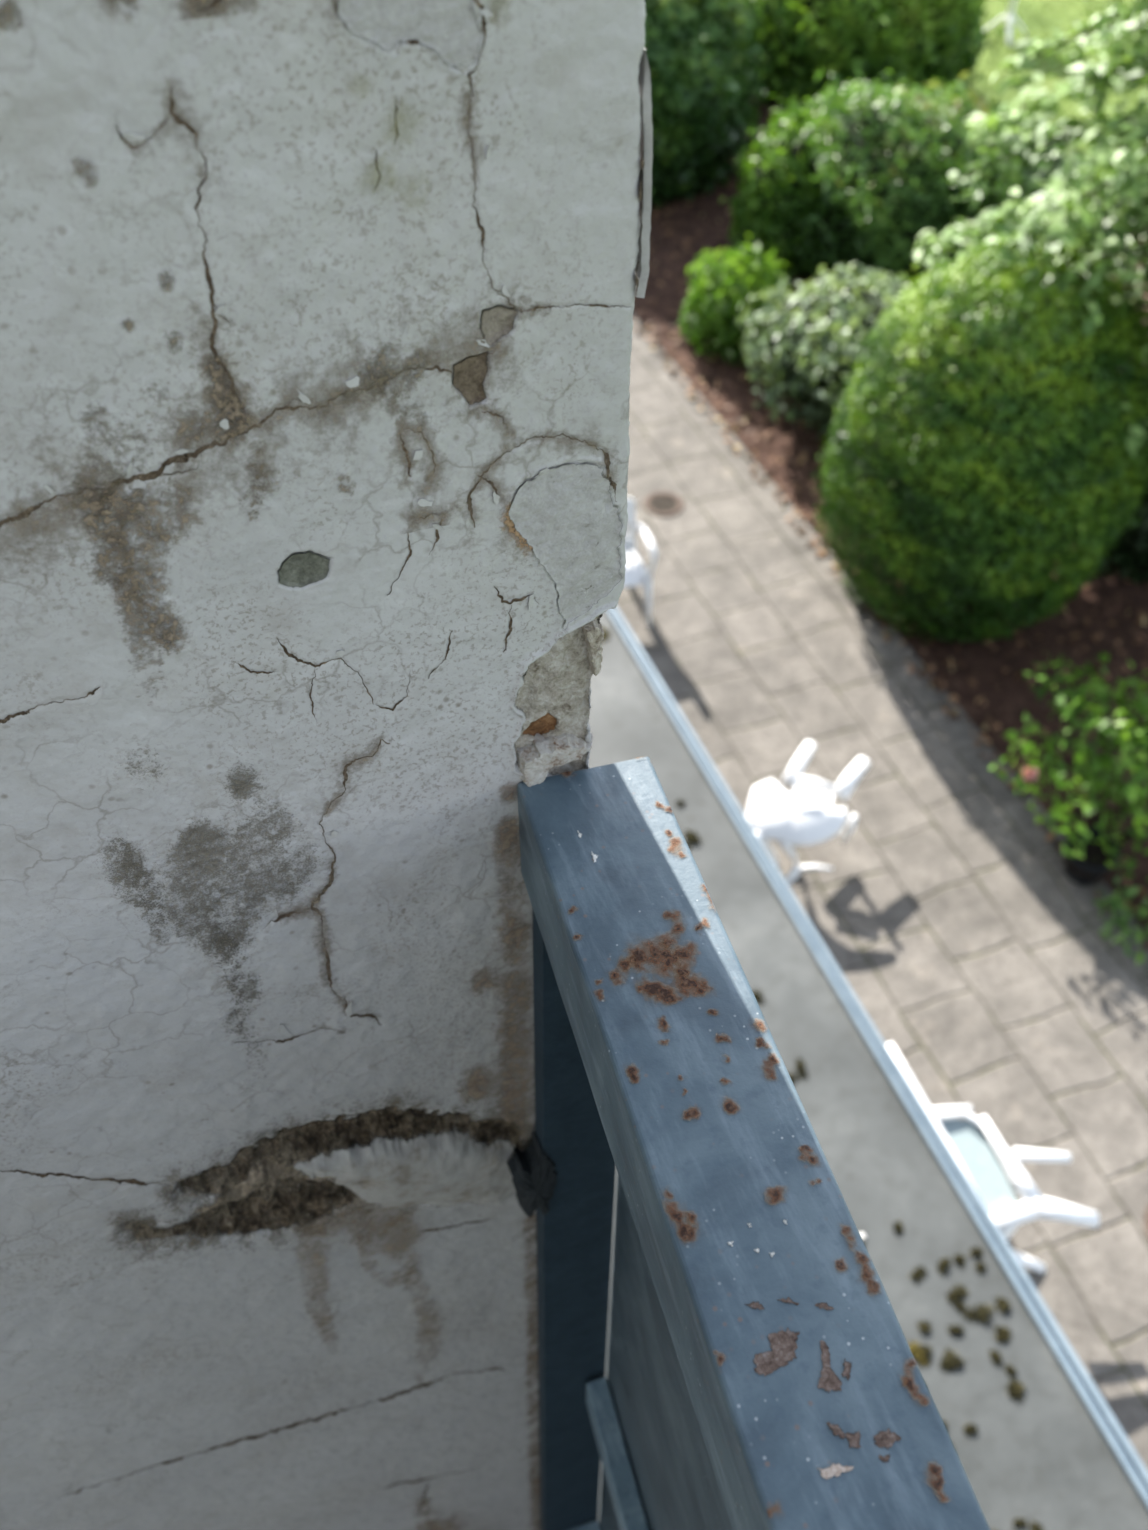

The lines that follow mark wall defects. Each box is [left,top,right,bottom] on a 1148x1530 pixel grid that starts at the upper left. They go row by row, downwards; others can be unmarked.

crack [0,0,633,596]
spalling [453,306,517,405]
spalling [279,552,330,588]
crack [494,587,539,652]
crack [0,687,100,724]
spalling [515,614,604,787]
crack [235,631,452,1043]
corrosion [595,885,717,1045]
corrosion [753,1019,779,1080]
crack [1,1170,167,1186]
corrosion [664,1190,697,1242]
corrosion [835,1225,880,1294]